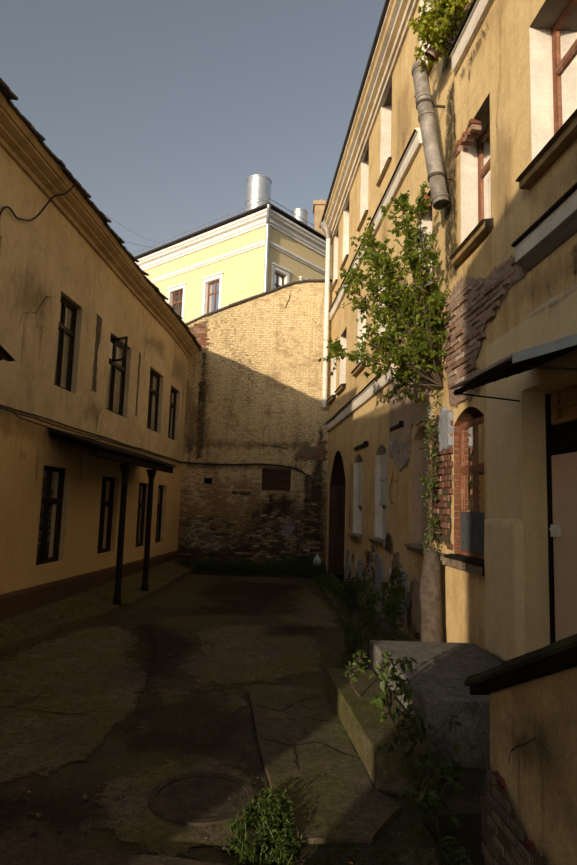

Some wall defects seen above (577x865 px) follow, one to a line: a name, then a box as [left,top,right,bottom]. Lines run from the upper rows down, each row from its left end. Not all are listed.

flaking render [189,319,209,350]
flaking render [387,255,530,550]
crack [250,695,357,797]
flaking render [479,754,548,865]